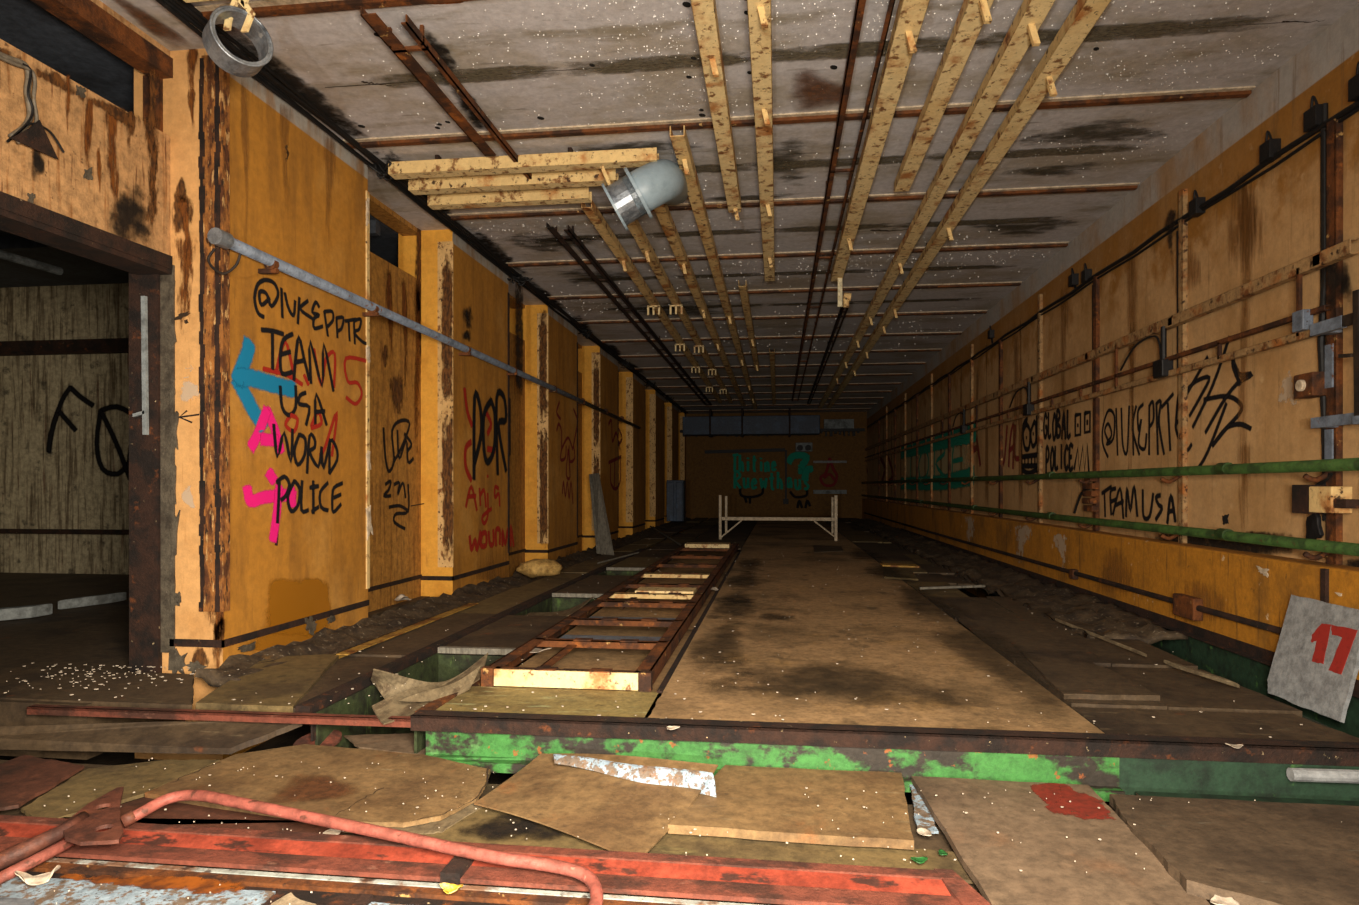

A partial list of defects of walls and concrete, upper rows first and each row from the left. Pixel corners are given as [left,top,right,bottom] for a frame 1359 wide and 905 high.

corrosion [117,0,198,122]
corrosion [36,69,159,225]
damp [695,164,748,173]
damp [773,142,860,179]
damp [878,156,904,165]
damp [964,151,984,160]
damp [1003,121,1152,176]
corrosion [172,178,195,321]
damp [957,217,1073,234]
peeling [198,58,221,612]
spalling [167,275,181,623]
spalling [168,648,207,674]